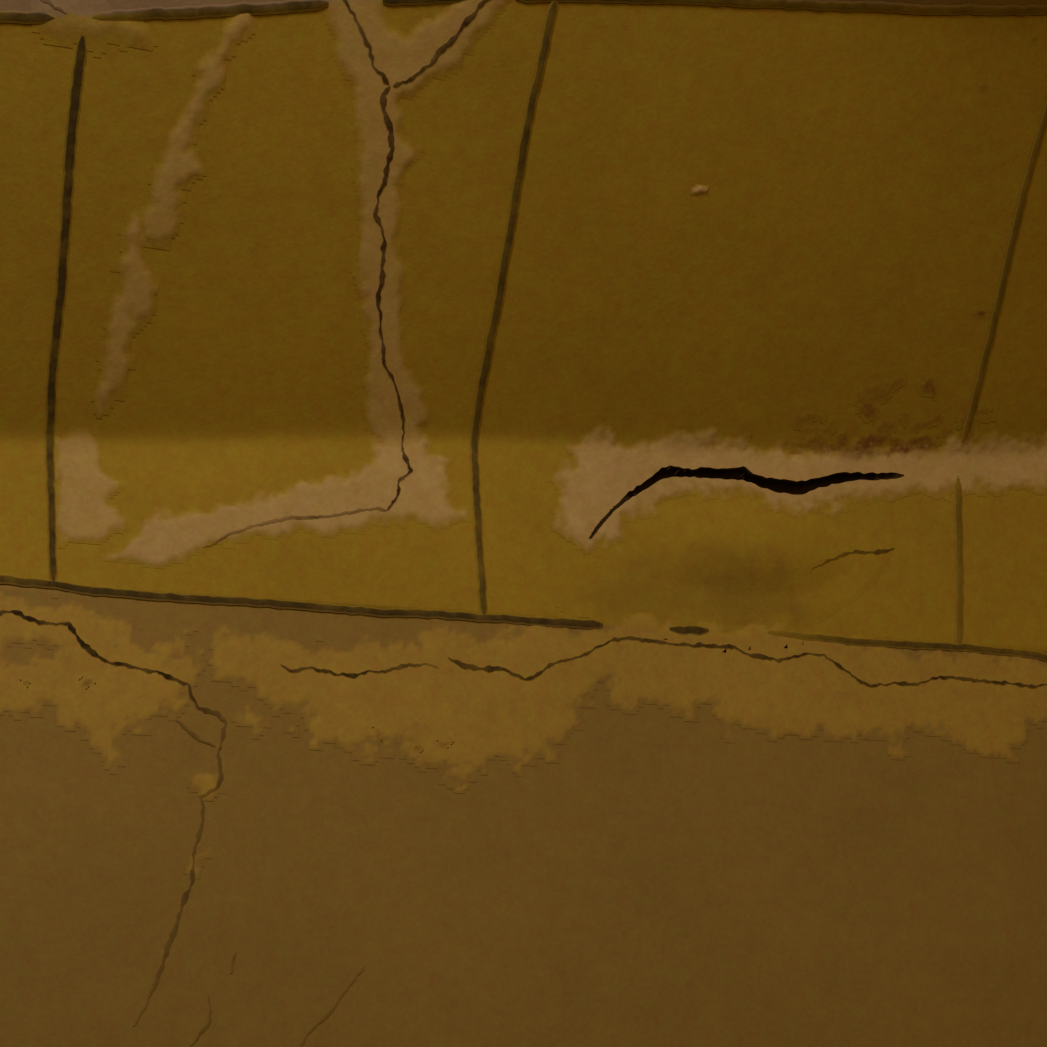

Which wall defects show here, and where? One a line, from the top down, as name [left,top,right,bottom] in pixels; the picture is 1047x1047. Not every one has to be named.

leakage [91,0,511,569]
crack [203,0,489,548]
crack [589,465,904,539]
leakage [730,427,1047,519]
leakage [555,524,821,652]
crack [280,636,1047,689]
crack [0,610,227,1026]